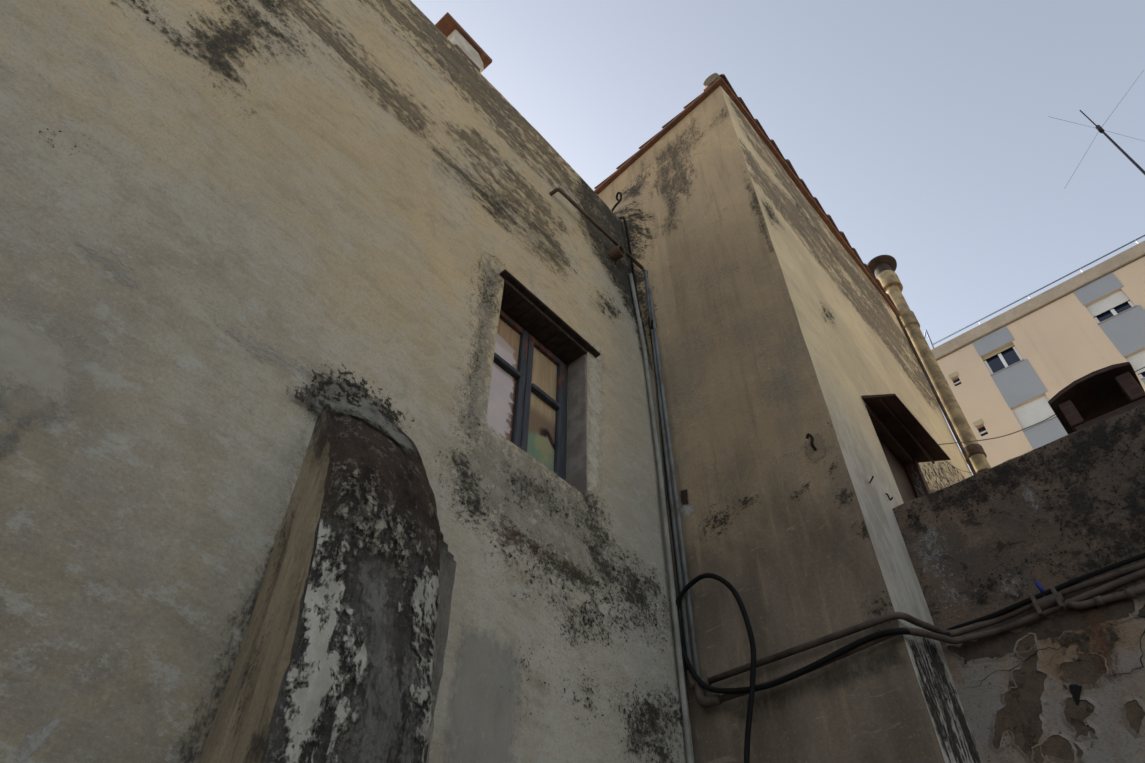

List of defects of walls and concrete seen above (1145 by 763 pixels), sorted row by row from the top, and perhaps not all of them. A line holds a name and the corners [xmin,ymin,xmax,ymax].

damp [111,0,938,408]
peeling [266,460,442,763]
damp [476,515,685,763]
damp [893,407,1145,609]
flaking render [908,585,1145,763]
crack [1103,616,1145,678]